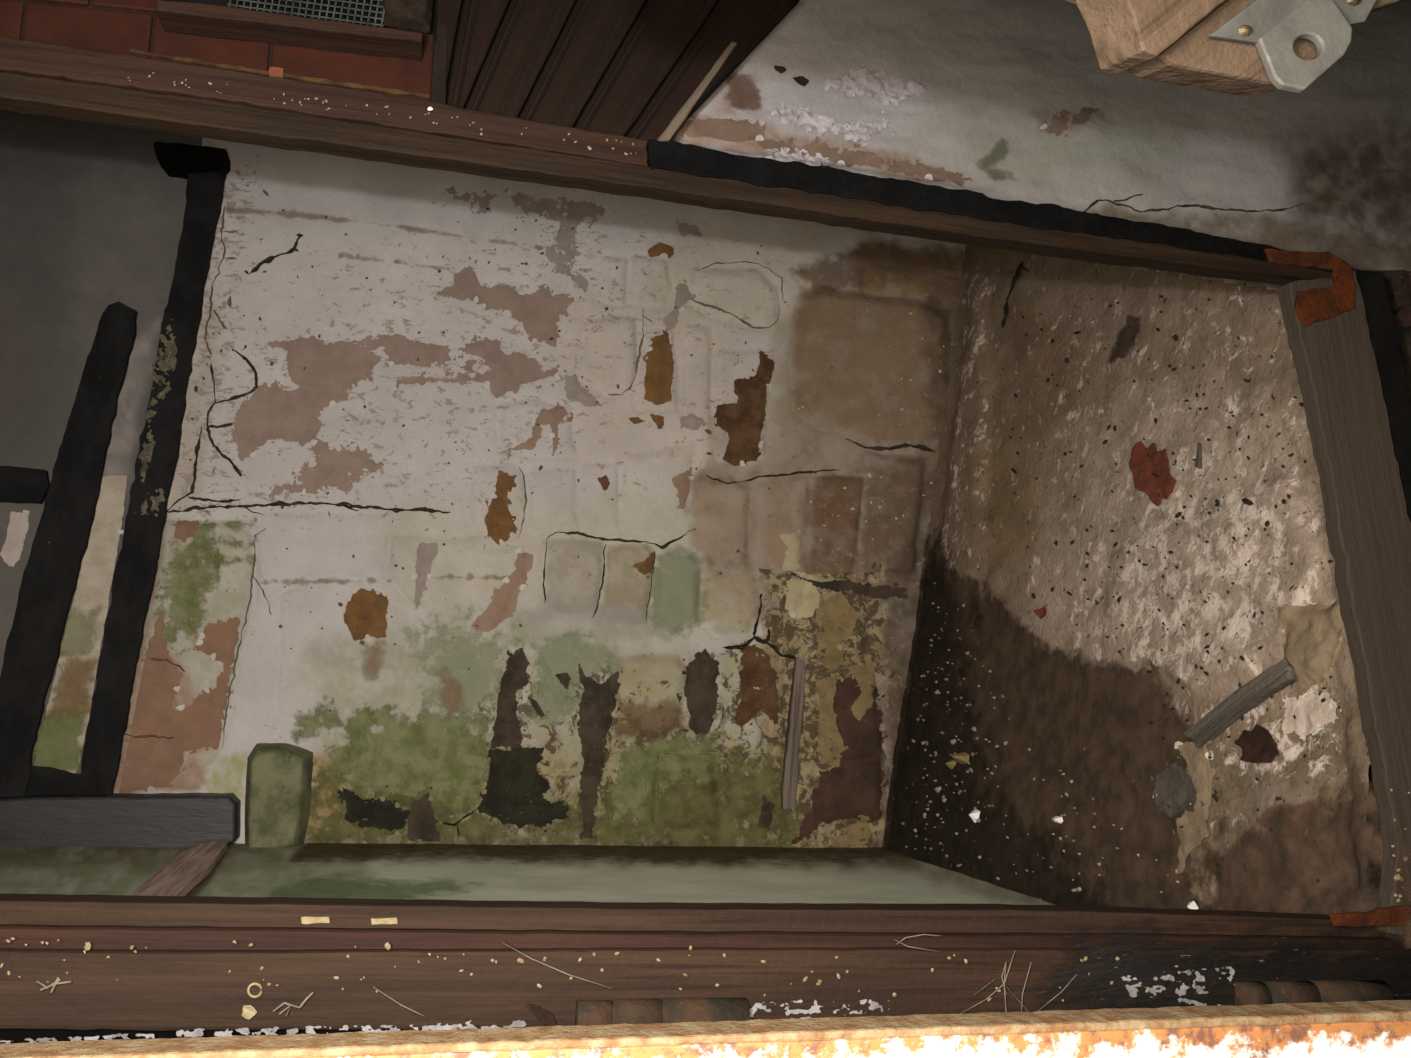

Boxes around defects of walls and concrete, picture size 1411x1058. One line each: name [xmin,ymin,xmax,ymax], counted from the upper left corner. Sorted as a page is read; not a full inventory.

peeling [119,612,240,793]
crack [167,206,450,748]
spalling [343,587,393,646]
spalling [337,785,449,844]
peeling [230,186,613,632]
peeling [477,645,622,840]
crack [519,468,692,619]
spalling [629,279,774,467]
peeling [677,640,780,735]
crack [706,439,937,484]
peeling [791,673,889,844]
damp [291,535,1411,1010]